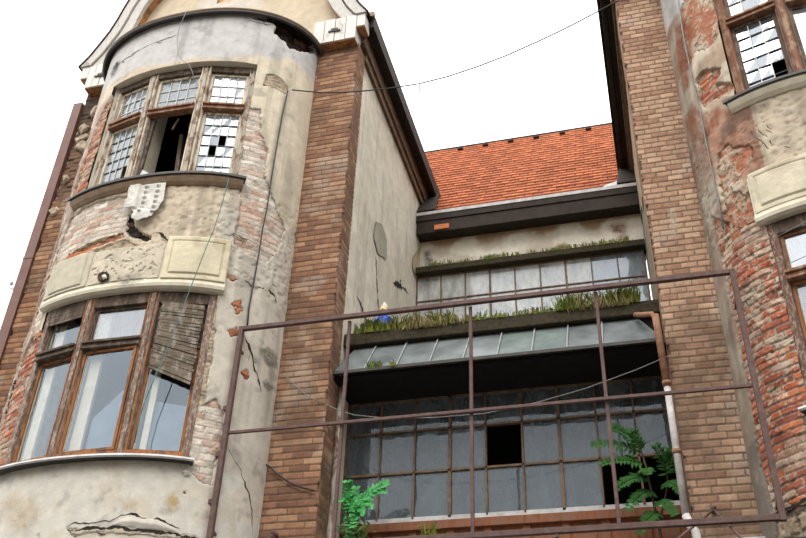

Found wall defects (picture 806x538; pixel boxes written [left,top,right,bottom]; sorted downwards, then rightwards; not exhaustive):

crack [117,35,175,66]
flaking render [681,0,718,63]
flaking render [696,69,735,108]
flaking render [0,96,151,466]
flaking render [714,145,806,538]
flaking render [67,528,184,538]